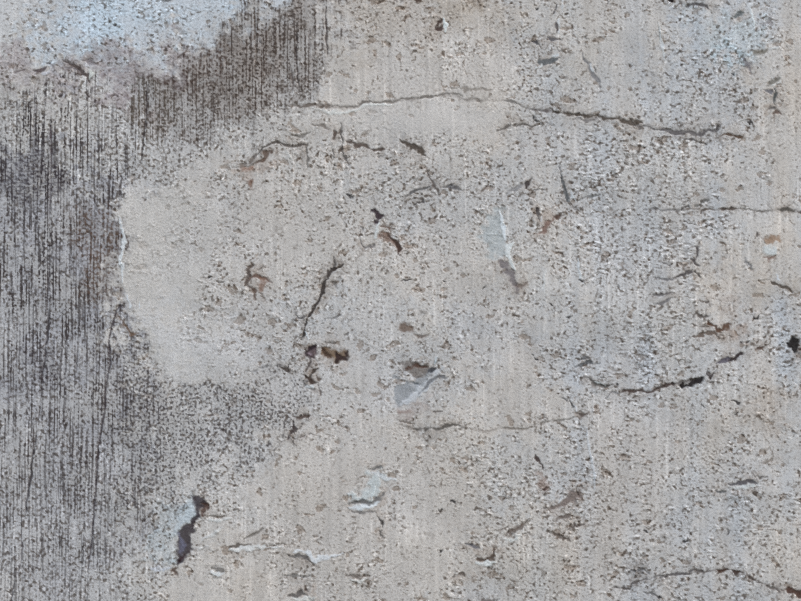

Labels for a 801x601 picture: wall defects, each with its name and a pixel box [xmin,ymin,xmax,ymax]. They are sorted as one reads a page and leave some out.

crack [544,0,571,40]
crack [668,0,719,16]
crack [232,85,747,219]
leakage [0,0,360,601]
crack [276,247,349,377]
crack [394,190,801,443]
spalling [142,487,242,601]
spalling [279,580,324,601]
crack [607,556,801,601]